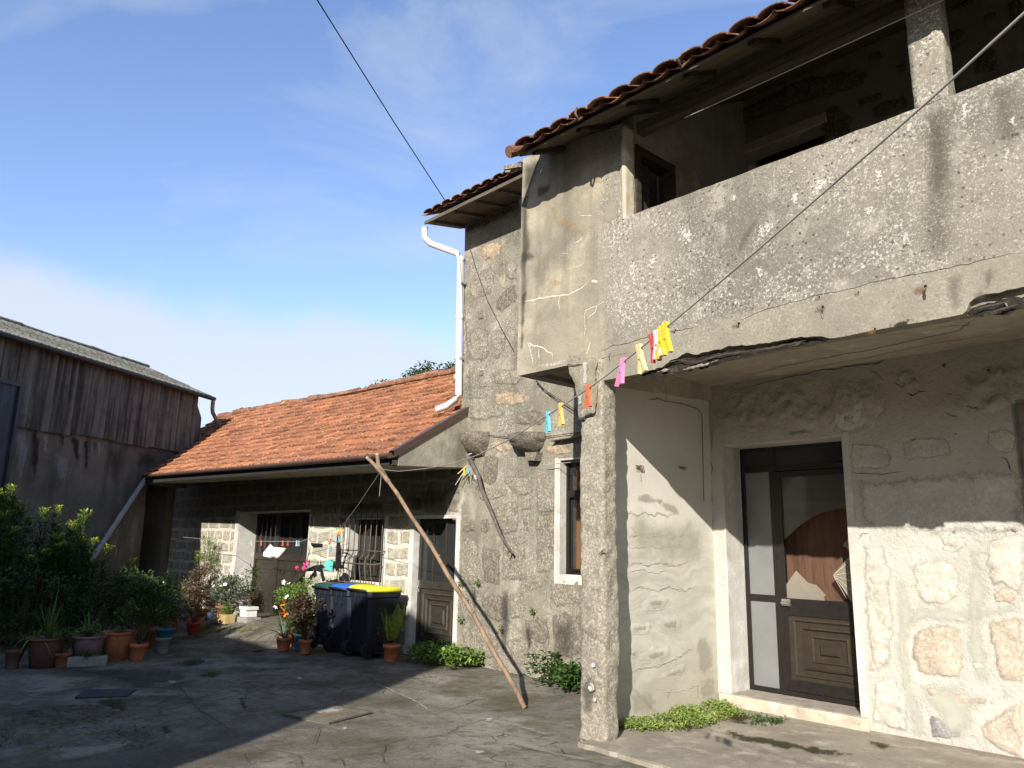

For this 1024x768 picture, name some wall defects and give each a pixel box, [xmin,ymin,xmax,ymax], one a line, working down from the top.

crack [524,215,697,360]
spalling [969,296,1024,317]
spalling [641,339,827,378]
flaking render [860,471,1024,604]
flaking render [864,546,908,730]
flaking render [913,617,1024,704]
flaking render [930,716,960,739]
flaking render [982,705,1023,757]